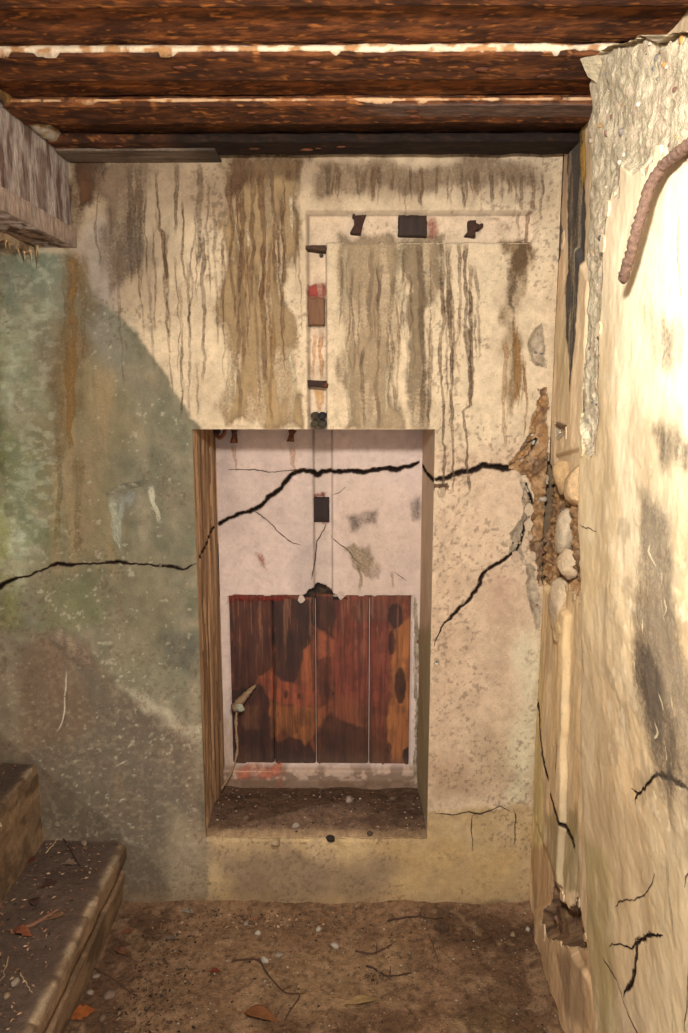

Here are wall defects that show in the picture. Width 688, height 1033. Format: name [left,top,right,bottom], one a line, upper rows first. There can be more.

damp [69,163,169,289]
damp [317,154,545,250]
corrosion [618,137,688,284]
damp [174,155,304,429]
damp [337,234,476,488]
flaking render [506,33,688,644]
damp [148,487,161,520]
crack [0,438,538,646]
crack [631,772,688,799]
flaking render [541,879,587,950]
crack [615,874,655,907]
crack [604,933,663,1033]